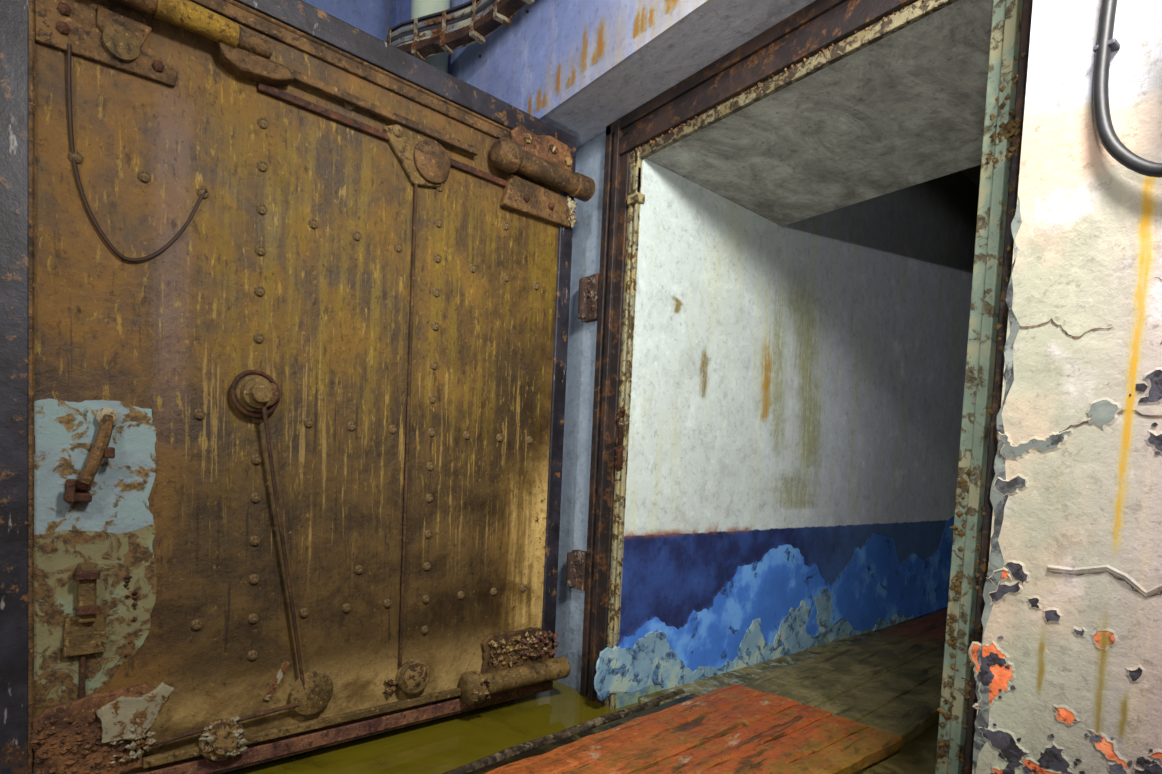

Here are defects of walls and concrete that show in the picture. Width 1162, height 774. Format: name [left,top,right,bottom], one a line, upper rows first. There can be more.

corrosion [528,21,605,114]
corrosion [633,0,677,38]
corrosion [734,6,905,99]
corrosion [986,52,1029,215]
crack [1019,318,1113,339]
corrosion [761,347,772,421]
corrosion [987,384,1003,464]
crack [1059,421,1089,433]
crack [1115,409,1162,418]
spalling [968,196,1162,774]
corrosion [937,469,989,771]
crack [1047,565,1162,598]